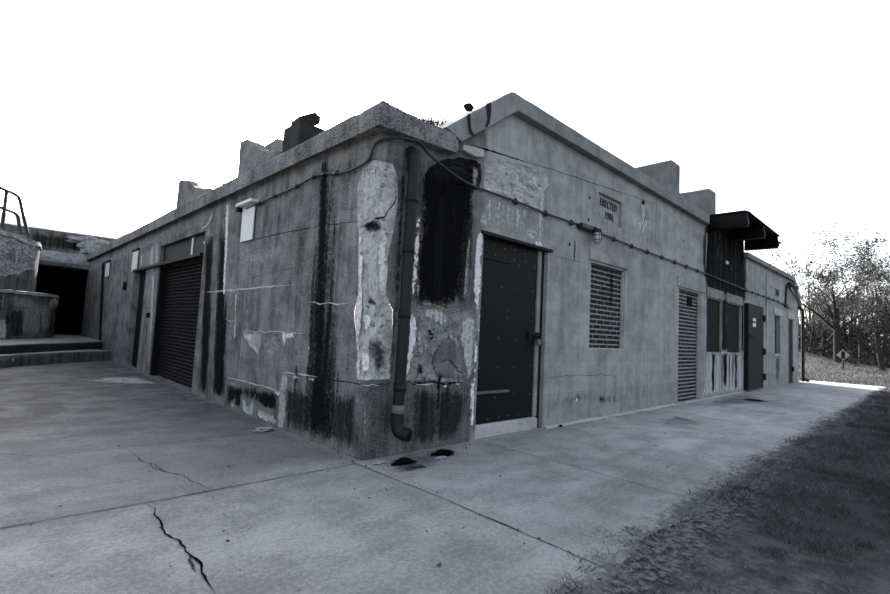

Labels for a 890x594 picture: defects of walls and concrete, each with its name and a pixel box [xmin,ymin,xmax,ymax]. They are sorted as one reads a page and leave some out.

spalling [0,230,36,277]
damp [199,162,366,445]
spalling [354,160,398,380]
damp [407,314,417,374]
spalling [406,303,477,382]
damp [414,342,478,443]
damp [412,168,527,312]
spalling [425,157,549,208]
damp [535,194,549,247]
damp [703,224,769,402]
crack [133,452,215,593]